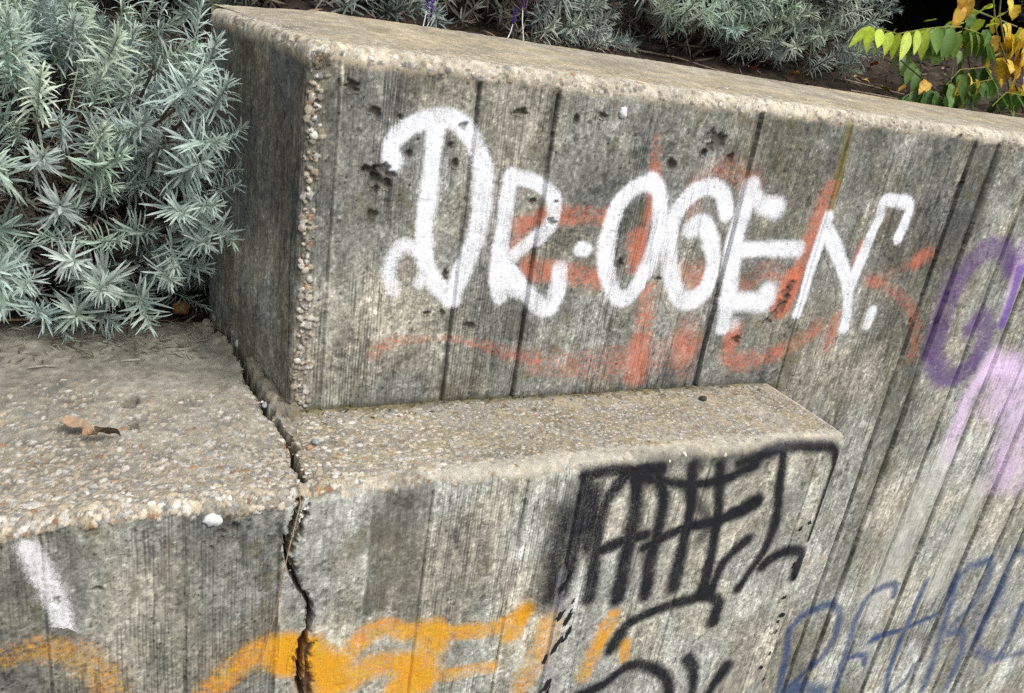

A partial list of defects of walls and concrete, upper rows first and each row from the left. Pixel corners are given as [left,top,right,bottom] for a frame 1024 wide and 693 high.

crack [210,232,317,658]